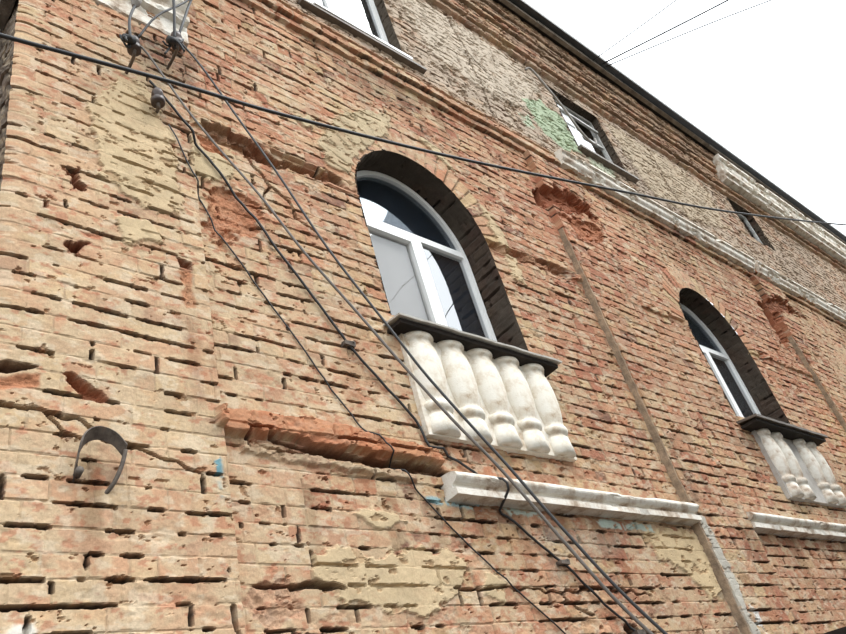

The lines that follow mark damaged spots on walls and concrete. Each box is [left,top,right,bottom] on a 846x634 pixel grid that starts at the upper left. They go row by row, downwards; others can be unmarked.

spalling [532,183,605,244]
spalling [757,294,807,354]
peeling [4,623,37,634]
spalling [242,578,311,634]